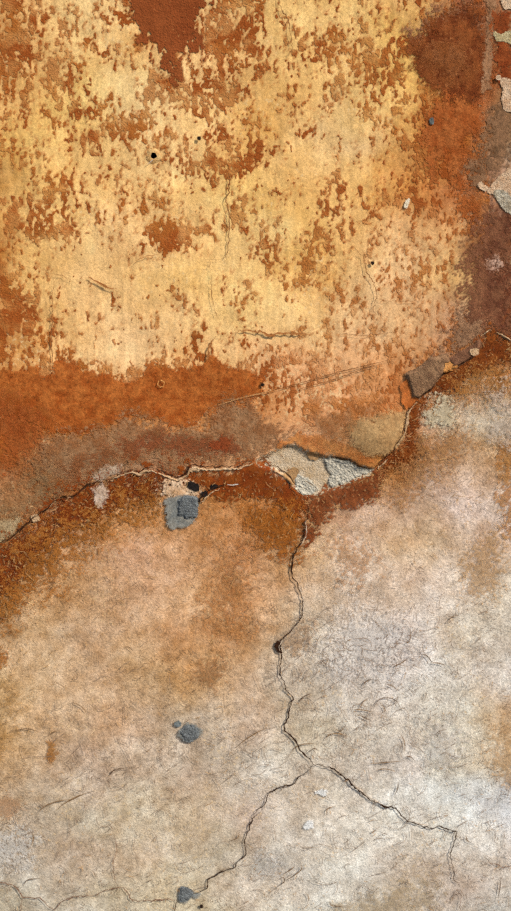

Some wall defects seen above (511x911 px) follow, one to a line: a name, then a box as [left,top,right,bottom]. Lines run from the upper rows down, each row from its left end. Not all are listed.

crack [373,330,511,469]
crack [0,462,462,911]